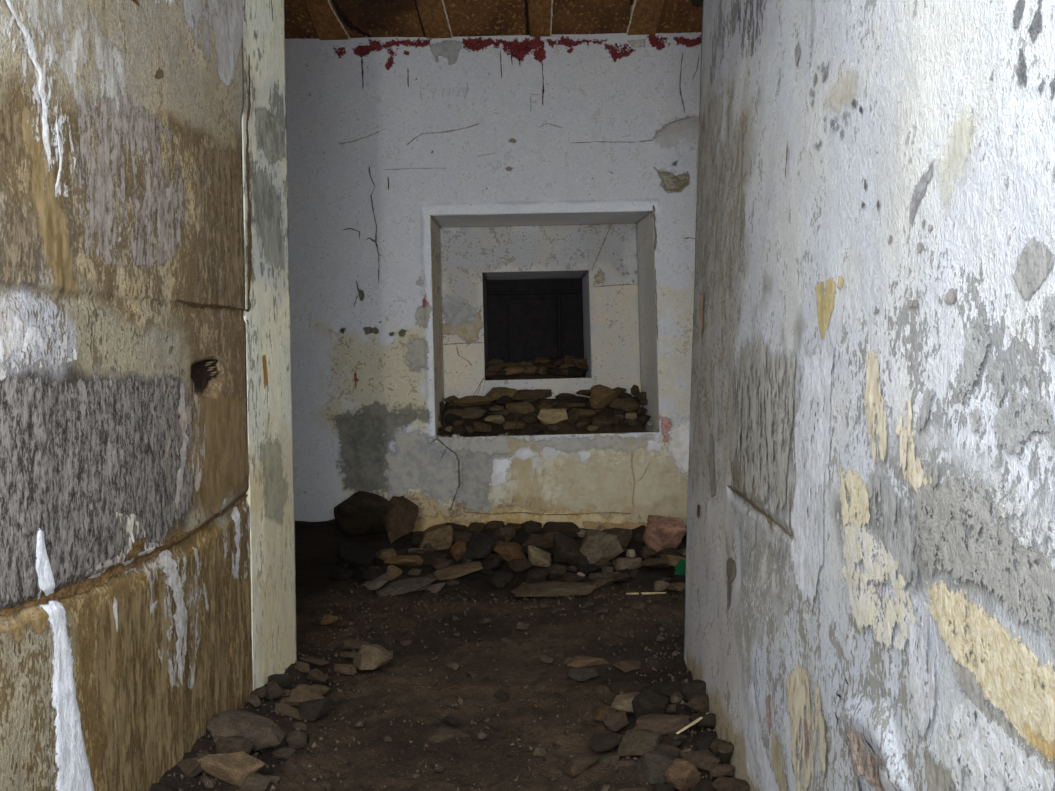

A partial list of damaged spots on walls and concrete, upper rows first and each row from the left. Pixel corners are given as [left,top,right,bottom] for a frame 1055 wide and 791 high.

peeling [333,0,765,84]
crack [176,56,252,324]
crack [343,123,480,308]
spalling [653,161,690,193]
peeling [1013,236,1055,353]
crack [0,494,248,617]
damp [36,379,288,791]
damp [335,402,629,528]
crack [431,436,651,515]
crack [727,485,793,536]
peeling [868,317,1055,656]
peeling [952,658,1055,775]